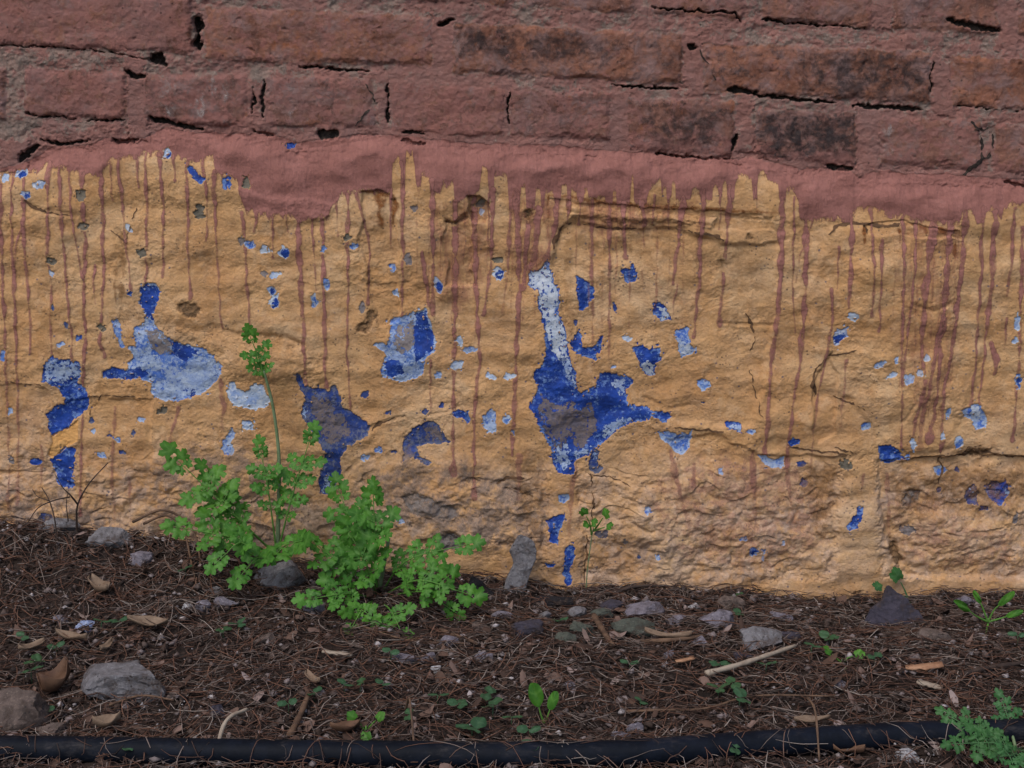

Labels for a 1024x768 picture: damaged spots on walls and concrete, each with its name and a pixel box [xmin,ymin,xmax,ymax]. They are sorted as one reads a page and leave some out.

crack [963,121,994,176]
peeling [29,446,79,489]
peeling [41,322,146,454]
peeling [102,283,270,456]
peeling [292,373,515,495]
peeling [357,308,478,383]
peeling [528,259,697,475]
peeling [878,438,917,463]